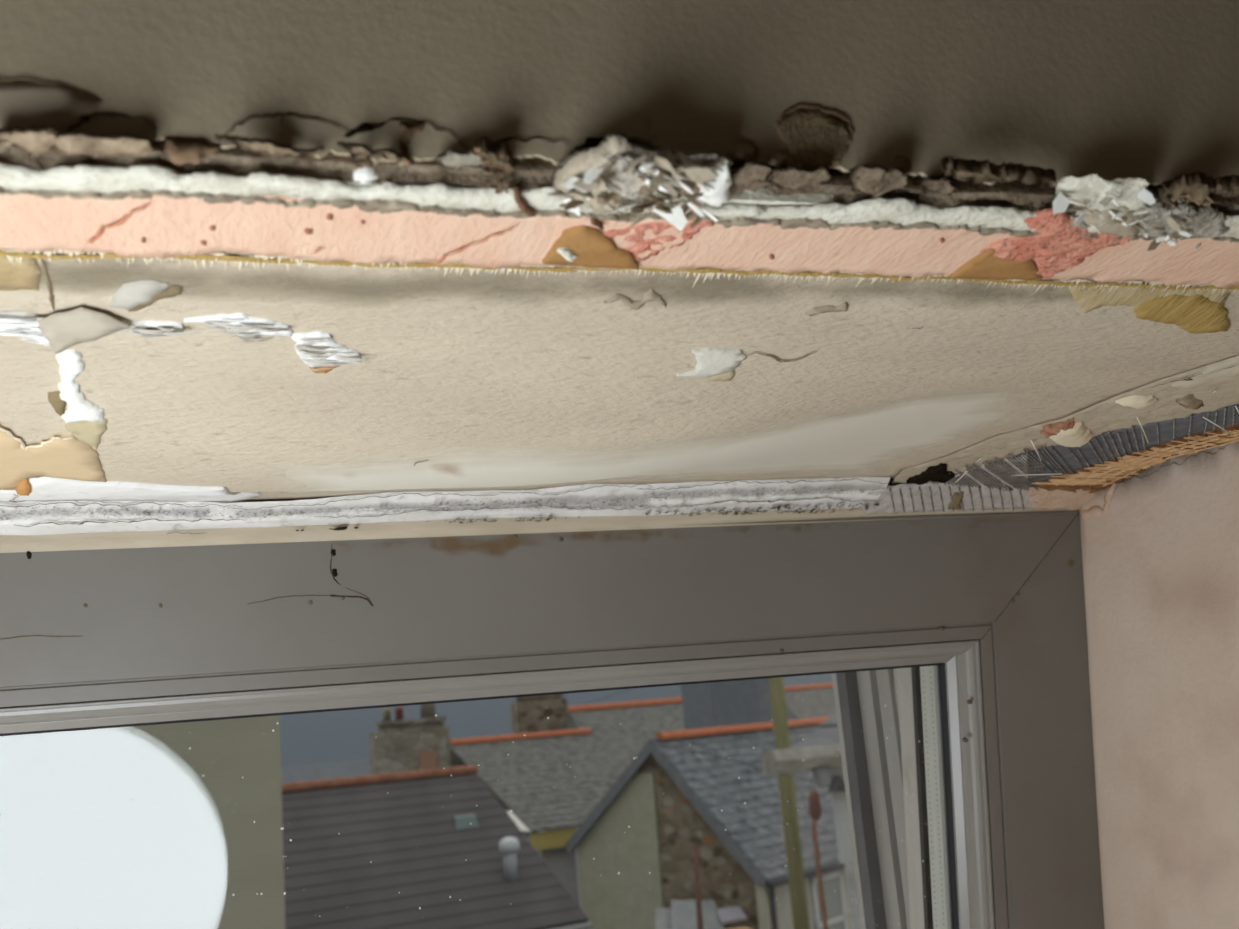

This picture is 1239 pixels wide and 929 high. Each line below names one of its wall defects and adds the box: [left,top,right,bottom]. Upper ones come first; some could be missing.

flaking render [0,126,561,194]
spalling [542,165,714,269]
flaking render [722,103,1239,334]
peeling [0,477,261,503]